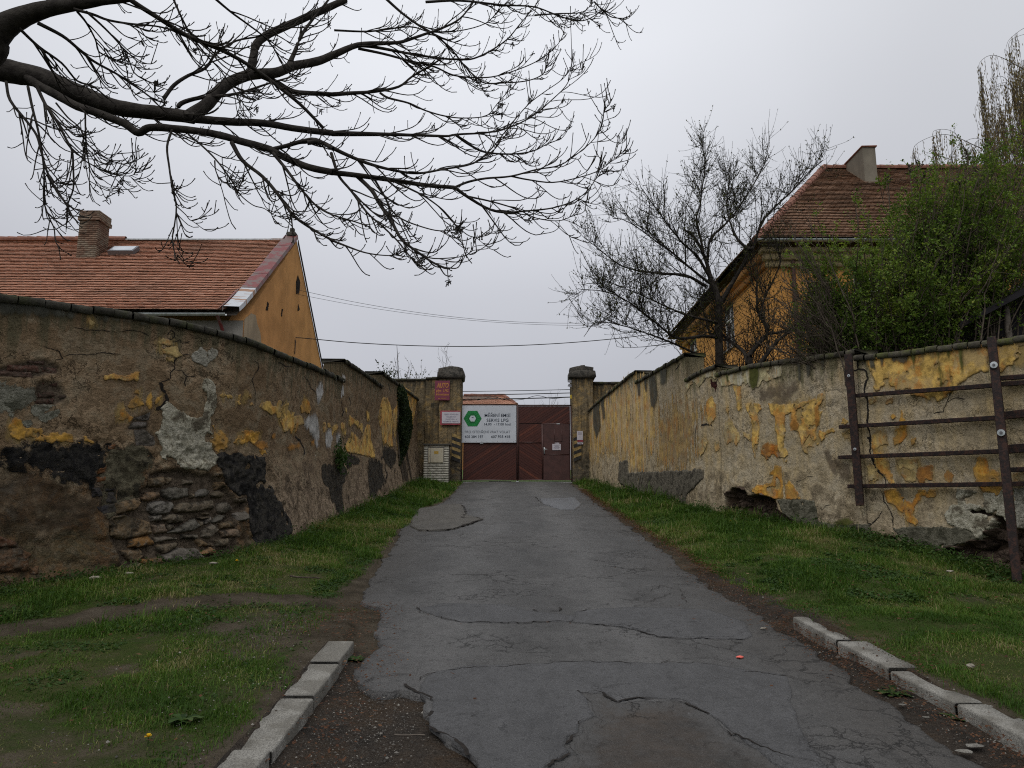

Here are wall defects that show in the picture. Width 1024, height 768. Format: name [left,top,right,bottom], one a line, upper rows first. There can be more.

peeling [8,417,94,444]
crack [46,327,196,410]
flaking render [104,372,162,446]
peeling [210,425,267,456]
peeling [323,388,417,458]
peeling [685,365,851,523]
crack [854,354,894,531]
peeling [866,342,1024,526]
flaking render [109,472,250,568]
spalling [935,528,1024,572]
crack [365,663,527,755]
crack [546,690,812,766]